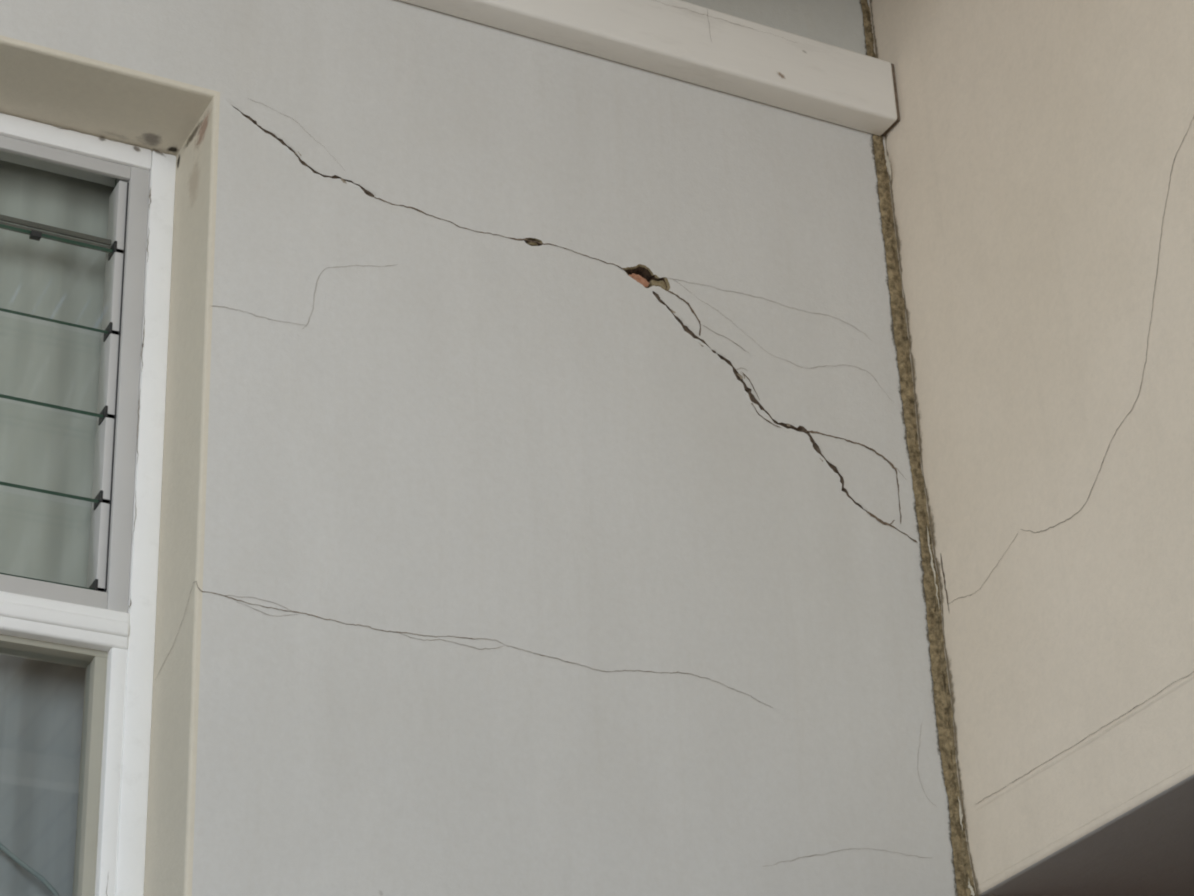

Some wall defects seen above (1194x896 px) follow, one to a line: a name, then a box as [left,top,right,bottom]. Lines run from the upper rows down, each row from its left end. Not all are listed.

crack [223,98,626,271]
spalling [623,264,670,291]
crack [651,278,918,543]
crack [947,117,1194,605]
crack [155,581,769,706]